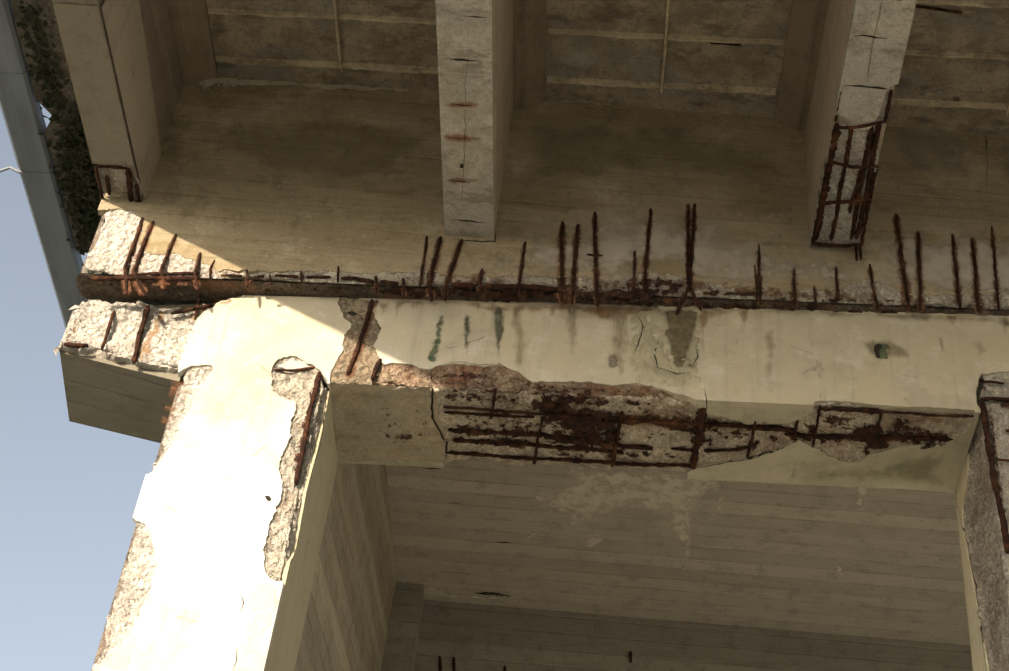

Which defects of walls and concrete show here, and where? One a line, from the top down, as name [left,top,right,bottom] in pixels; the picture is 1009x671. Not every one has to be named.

damp [495,307,504,348]
corrosion [76,273,1009,326]
damp [665,310,722,367]
spalling [53,164,1009,671]